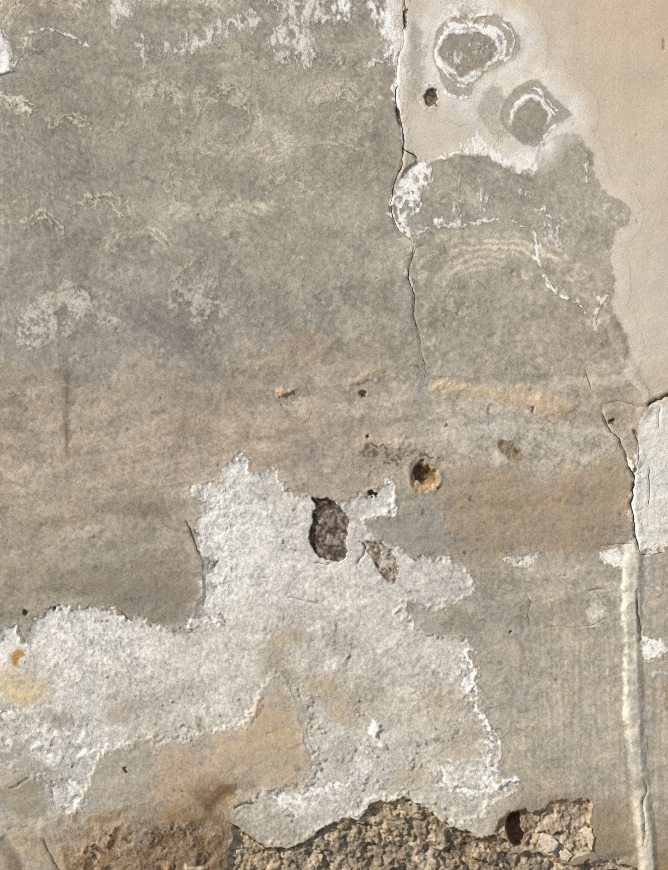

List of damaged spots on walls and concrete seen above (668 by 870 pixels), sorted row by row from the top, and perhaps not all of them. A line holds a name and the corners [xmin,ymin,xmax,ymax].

damp [0,0,644,458]
crack [390,3,425,377]
flaking render [0,450,638,870]
spalling [497,439,524,464]
crack [600,394,668,555]
flaking render [629,404,668,557]